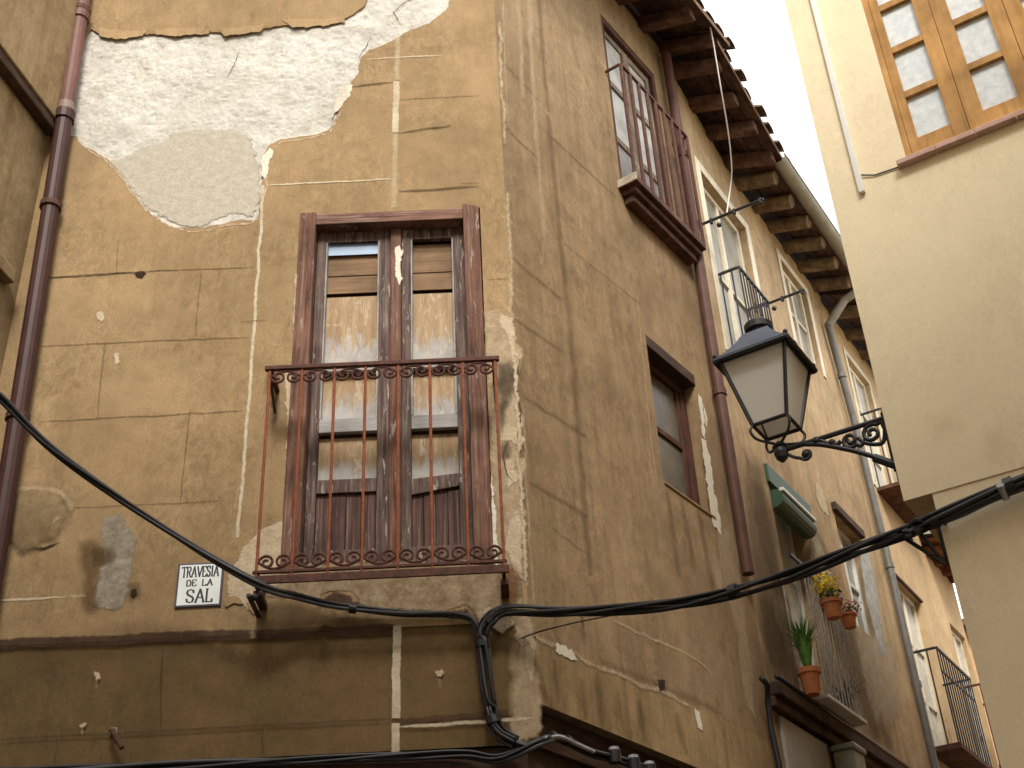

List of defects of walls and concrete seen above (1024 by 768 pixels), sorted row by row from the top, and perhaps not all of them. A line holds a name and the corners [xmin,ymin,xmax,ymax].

flaking render [71,0,449,232]
flaking render [484,283,532,585]
flaking render [698,394,738,589]
flaking render [476,607,783,768]